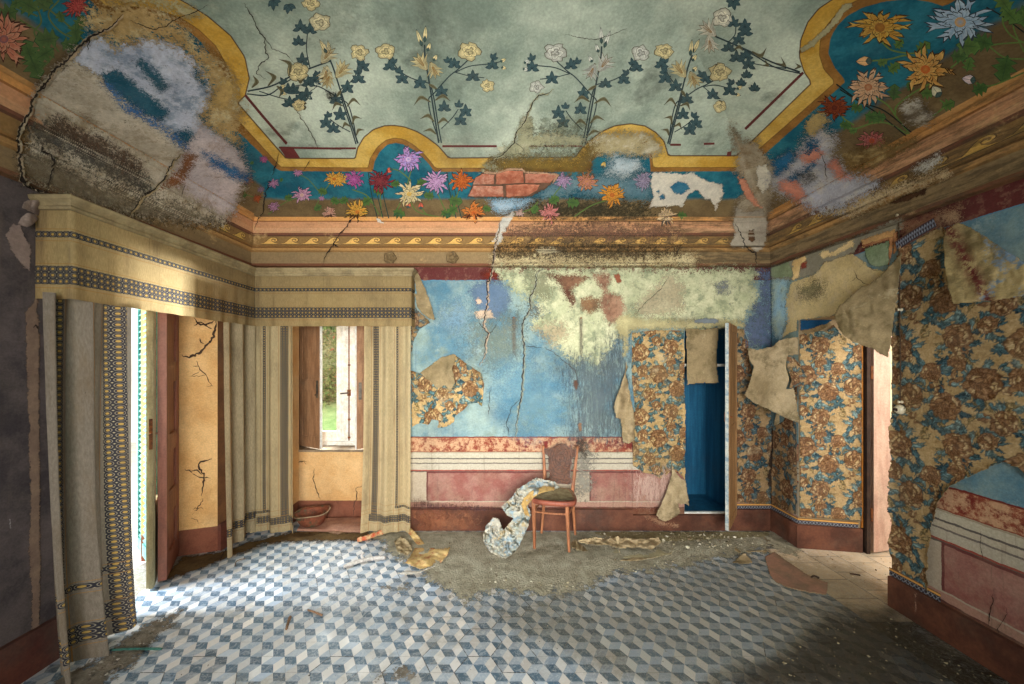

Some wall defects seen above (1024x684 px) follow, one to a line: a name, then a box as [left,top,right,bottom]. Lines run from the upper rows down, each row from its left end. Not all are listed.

crack [15,5,207,194]
peeling [5,0,255,271]
crack [130,154,185,217]
crack [324,212,359,259]
crack [491,89,554,162]
crack [477,223,578,437]
water stain [461,194,705,508]
peeling [480,229,897,376]
peeling [467,92,954,252]